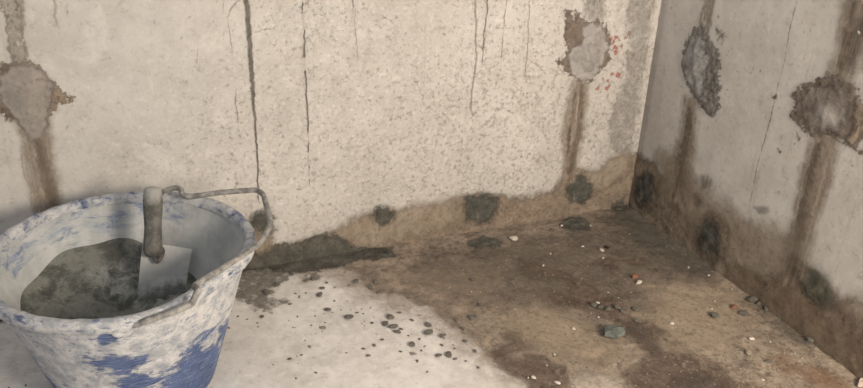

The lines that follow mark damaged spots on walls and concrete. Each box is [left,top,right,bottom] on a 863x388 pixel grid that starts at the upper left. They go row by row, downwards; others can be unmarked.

spalling [0,60,76,142]
crack [243,0,259,200]
crack [302,2,310,184]
spalling [557,9,612,84]
spalling [681,25,724,118]
spalling [790,72,863,154]
damp [829,0,863,83]
damp [20,128,58,213]
damp [242,81,863,388]